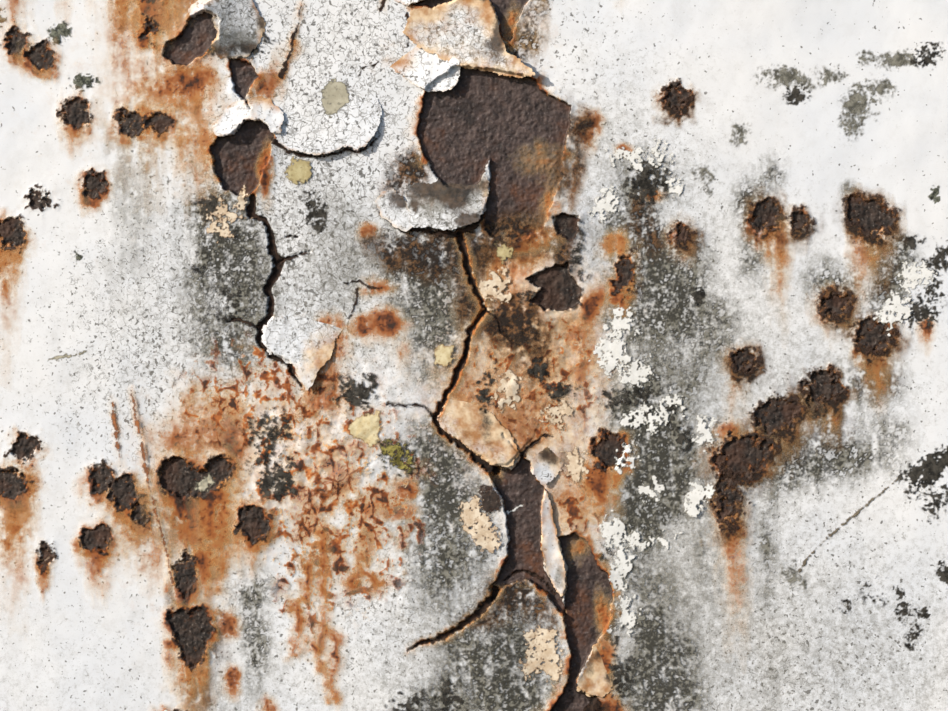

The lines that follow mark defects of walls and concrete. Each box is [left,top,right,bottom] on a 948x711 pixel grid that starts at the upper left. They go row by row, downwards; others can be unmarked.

peeling [163,0,312,243]
peeling [375,0,619,311]
damp [184,187,274,370]
rust [72,307,424,711]
crack [229,194,307,386]
crack [378,211,514,476]
crack [411,570,556,649]
peeling [477,456,683,711]
mould [601,155,733,711]
rust [708,364,850,593]
rust [816,285,907,394]
mould [898,444,948,522]